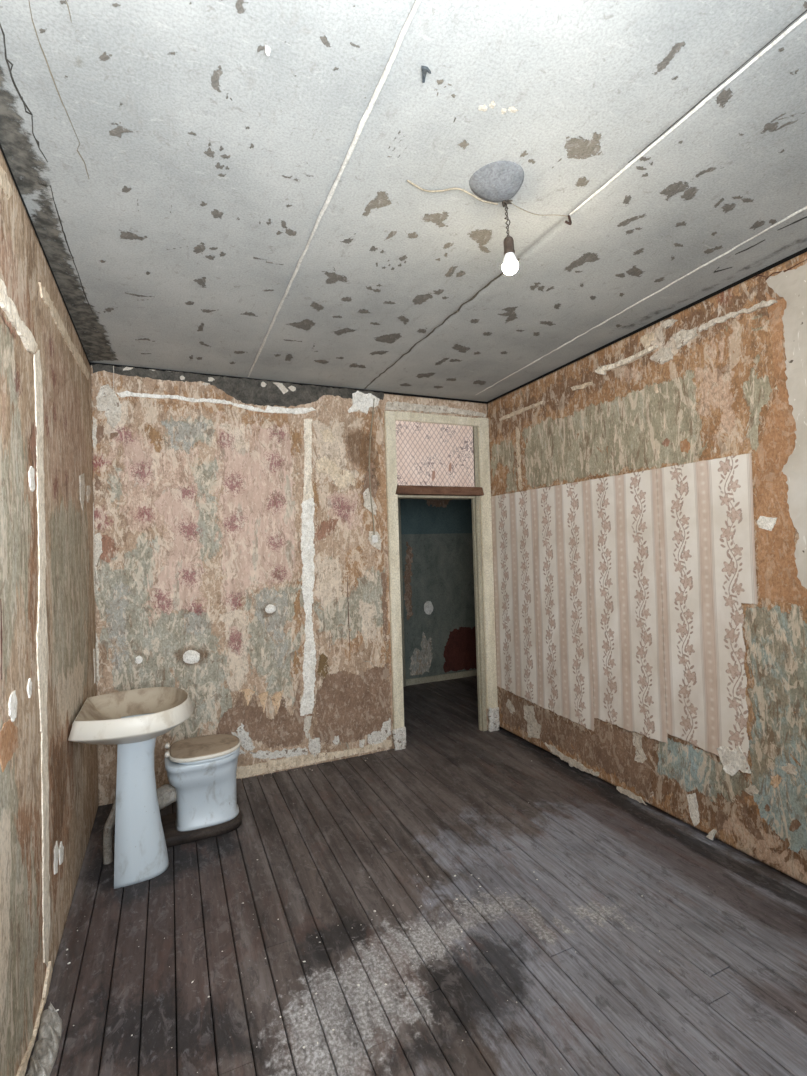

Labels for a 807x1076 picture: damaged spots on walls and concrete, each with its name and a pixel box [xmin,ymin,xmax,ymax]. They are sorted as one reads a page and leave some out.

peeling [652,42,685,80]
peeling [715,88,733,108]
crack [0,2,93,313]
peeling [552,132,602,168]
peeling [660,167,724,201]
peeling [467,229,492,253]
spalling [0,65,486,778]
flaking render [571,263,807,609]
flaking render [0,278,64,1076]
flaking render [500,693,658,805]
peeling [686,793,700,826]
peeling [717,745,797,840]